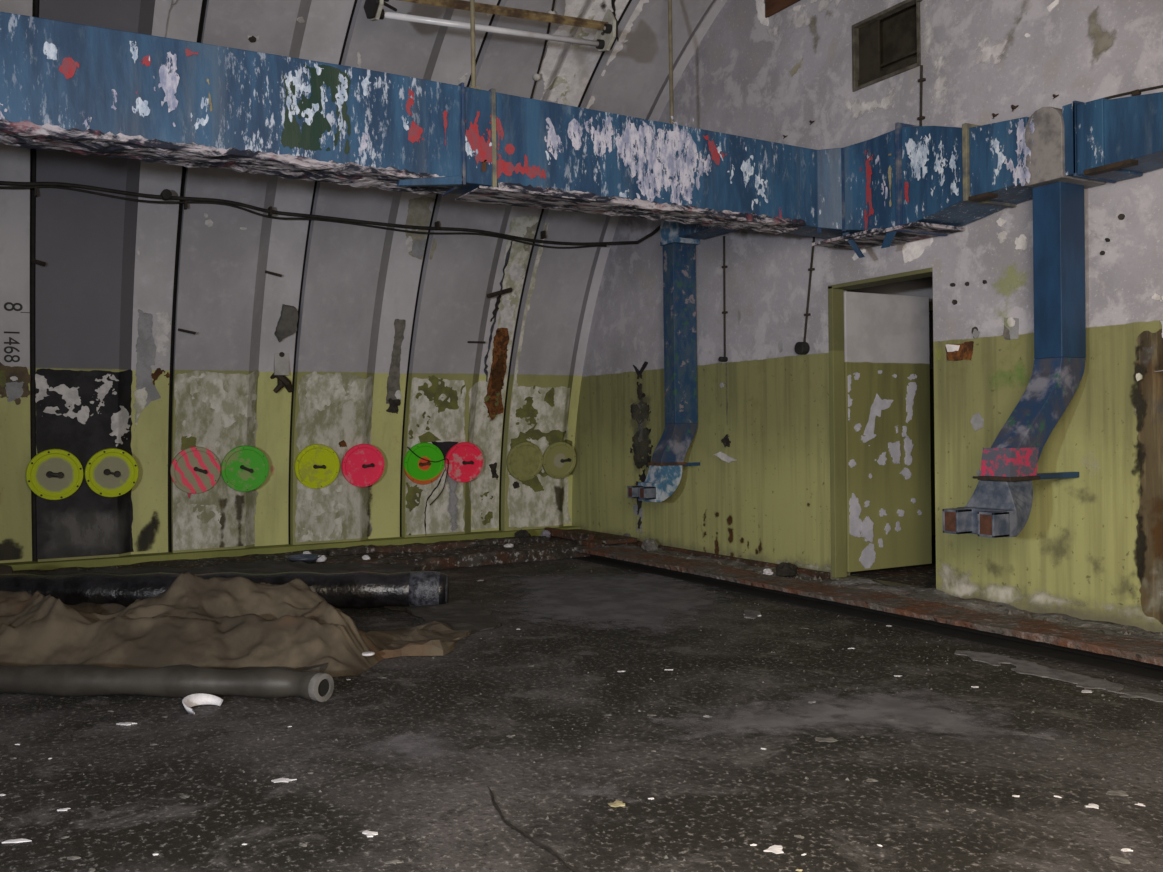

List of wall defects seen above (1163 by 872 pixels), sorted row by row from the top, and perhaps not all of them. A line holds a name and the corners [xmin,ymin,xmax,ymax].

peeling [43,41,79,79]
peeling [130,41,200,127]
peeling [191,79,213,129]
peeling [281,52,377,157]
peeling [402,88,424,143]
peeling [465,111,768,210]
peeling [986,116,1039,190]
corrosion [484,328,509,420]
peeling [0,309,259,551]
peeling [507,385,573,528]
crack [487,786,581,872]